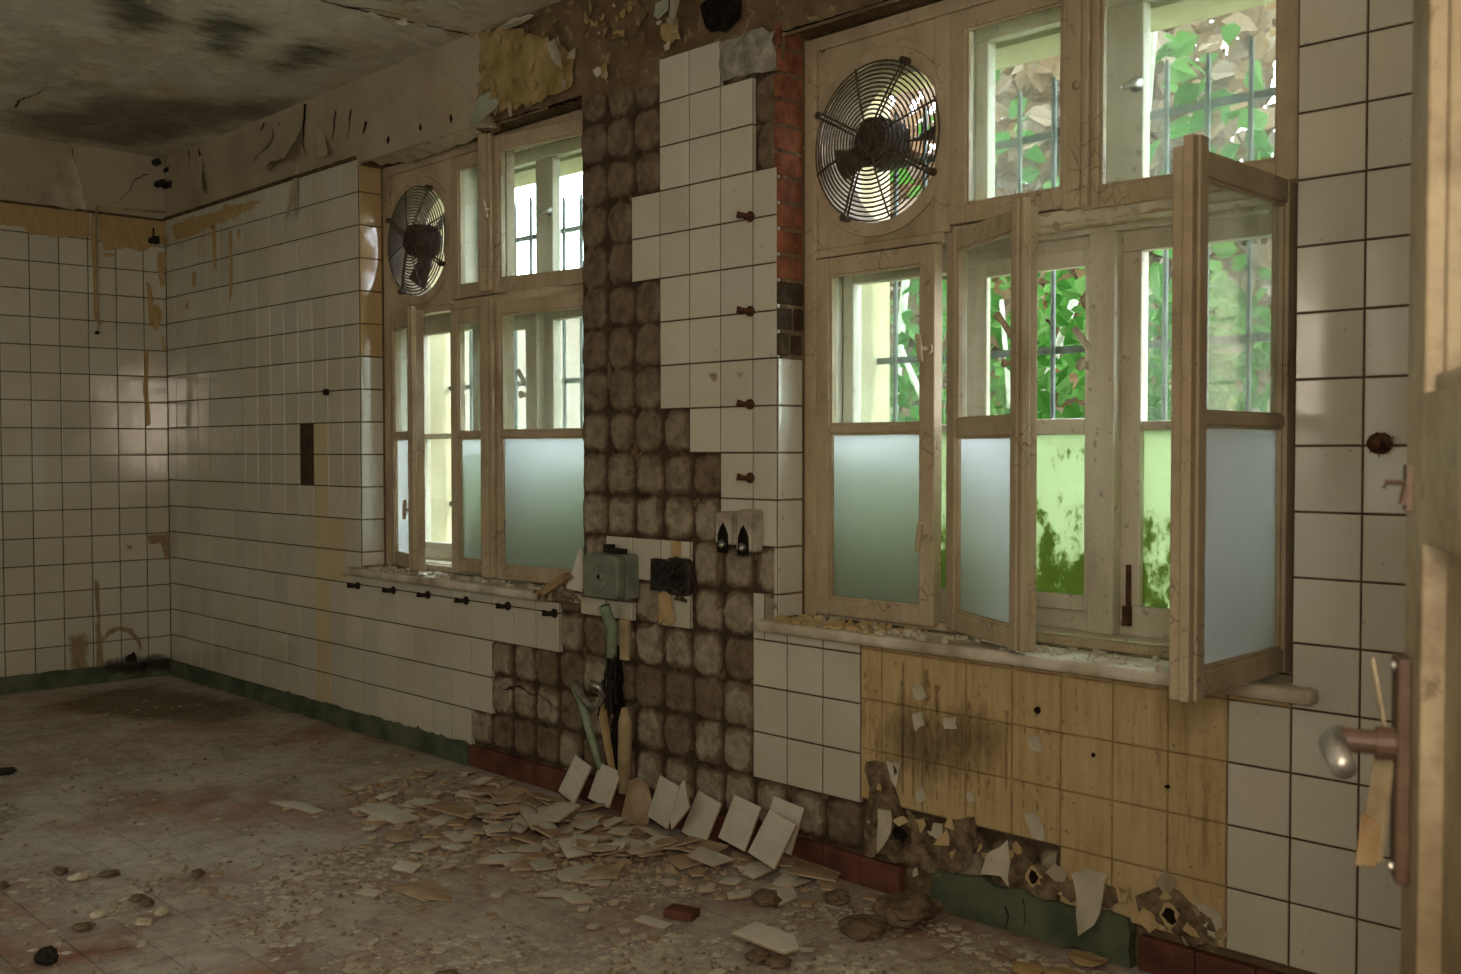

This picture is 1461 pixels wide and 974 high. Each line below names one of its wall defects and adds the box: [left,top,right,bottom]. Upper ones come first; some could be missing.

water stain [199,14,256,55]
peeling [252,106,303,172]
peeling [300,423,314,485]
peeling [450,0,1229,949]